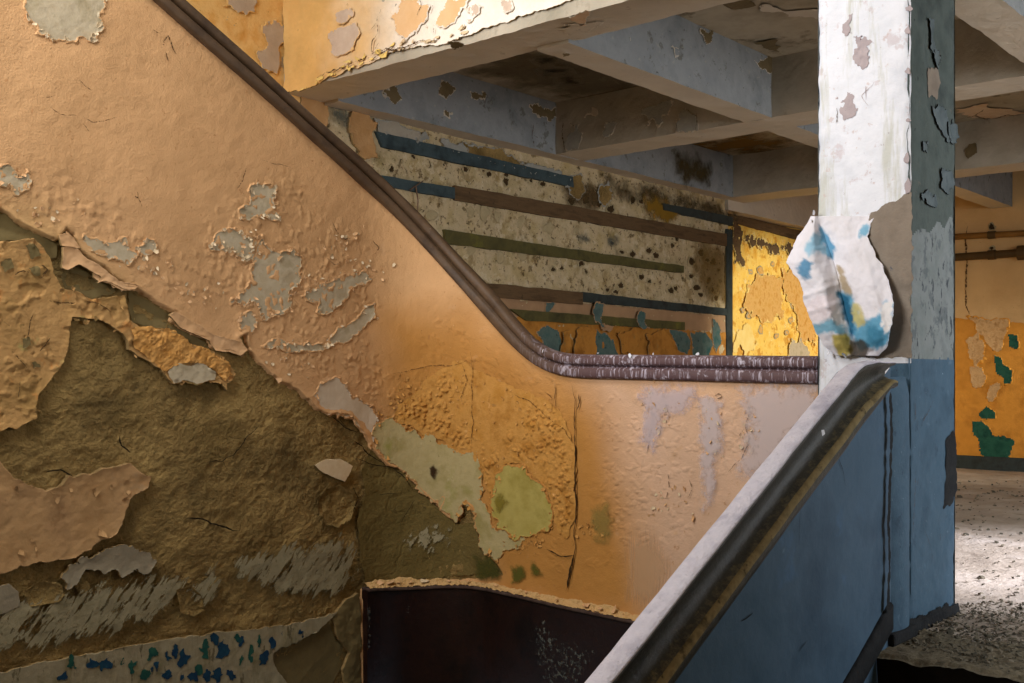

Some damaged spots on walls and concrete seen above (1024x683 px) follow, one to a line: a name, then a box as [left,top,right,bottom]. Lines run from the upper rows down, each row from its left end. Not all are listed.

peeling [23,0,107,44]
peeling [300,0,483,126]
peeling [501,0,514,13]
peeling [569,10,591,27]
peeling [927,18,1024,159]
flaking render [609,237,679,260]
peeling [667,168,955,359]
flaking render [0,163,558,683]
crack [516,388,580,588]
damp [642,387,724,511]
peeling [965,315,1021,458]